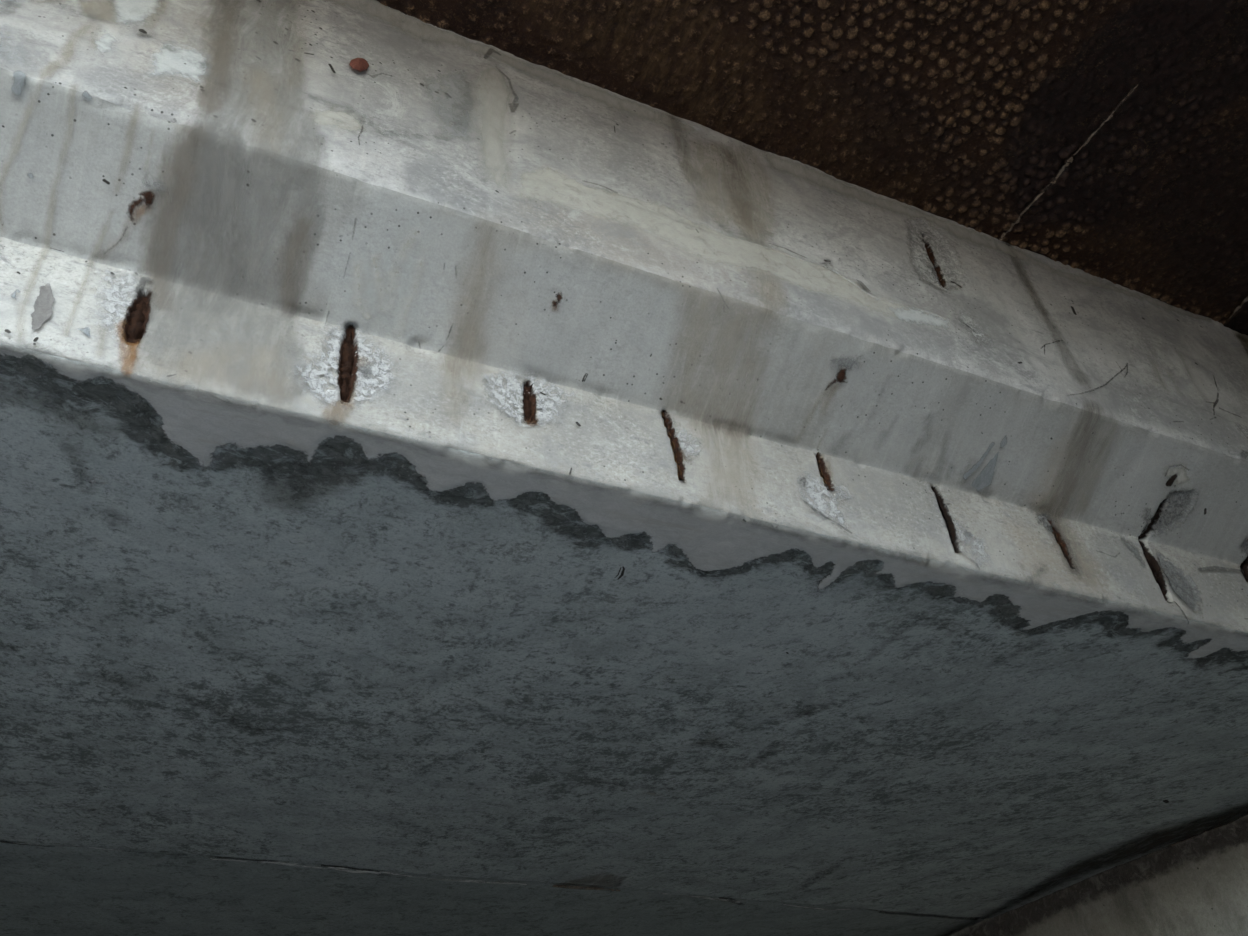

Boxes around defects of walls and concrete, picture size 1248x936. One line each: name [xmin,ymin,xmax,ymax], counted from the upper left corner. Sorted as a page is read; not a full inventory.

leakage [147,0,359,398]
corrosion [907,219,964,291]
corrosion [99,271,154,374]
corrosion [295,325,394,415]
corrosion [484,372,574,425]
corrosion [662,410,700,481]
peeling [0,346,1248,659]
corrosion [799,452,851,533]
corrosion [931,486,990,567]
corrosion [1037,514,1073,568]
corrosion [1121,465,1248,624]